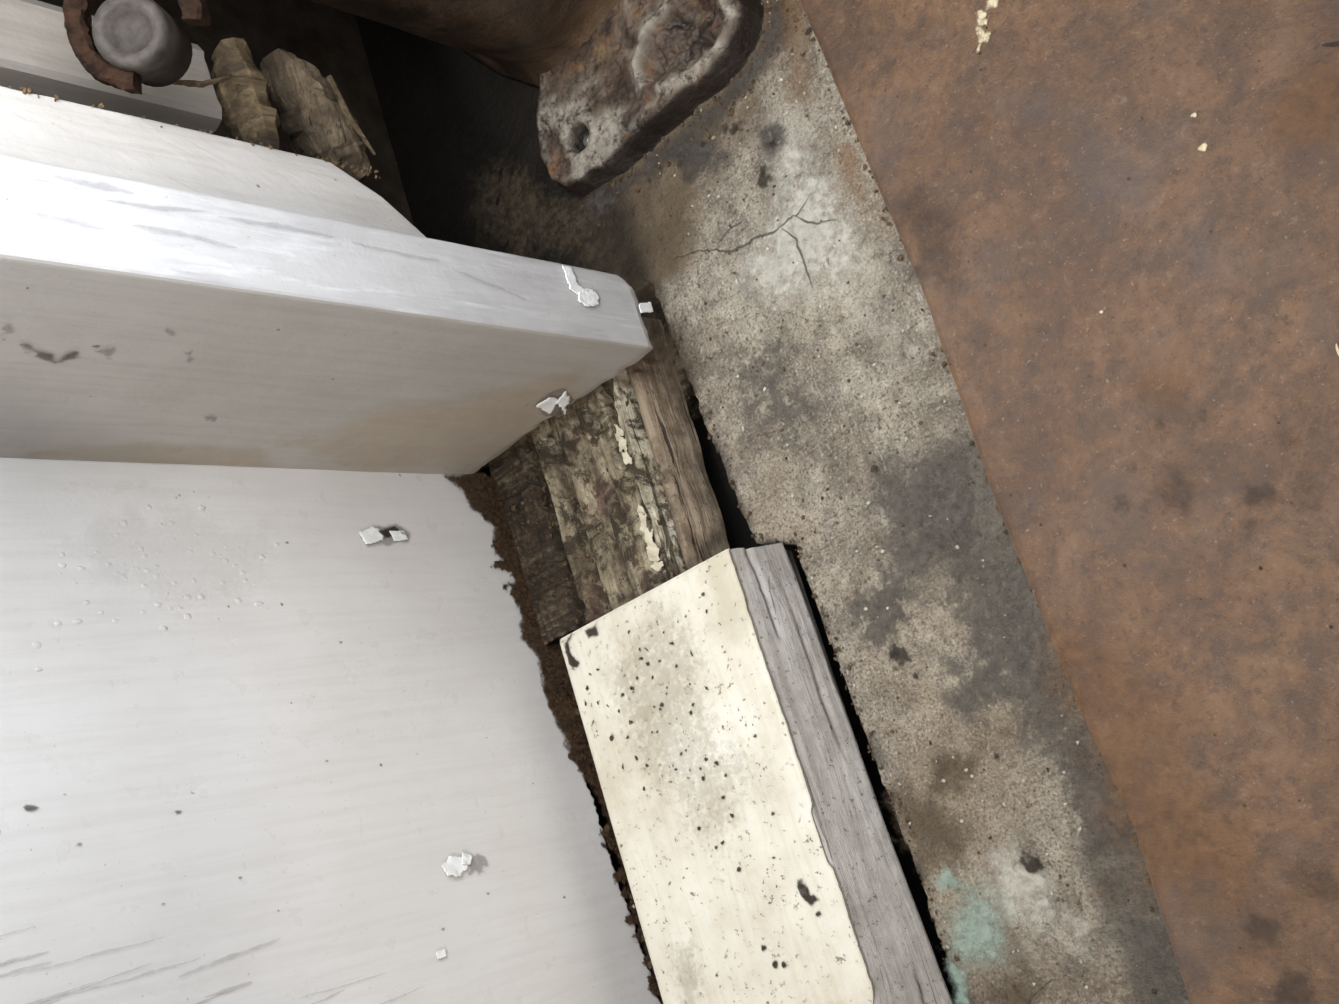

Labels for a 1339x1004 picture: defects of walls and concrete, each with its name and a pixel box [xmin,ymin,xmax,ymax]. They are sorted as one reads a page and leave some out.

peeling [562,265,600,307]
peeling [638,302,653,313]
crack [674,198,835,286]
leakage [850,455,1140,861]
leakage [950,859,1048,1004]